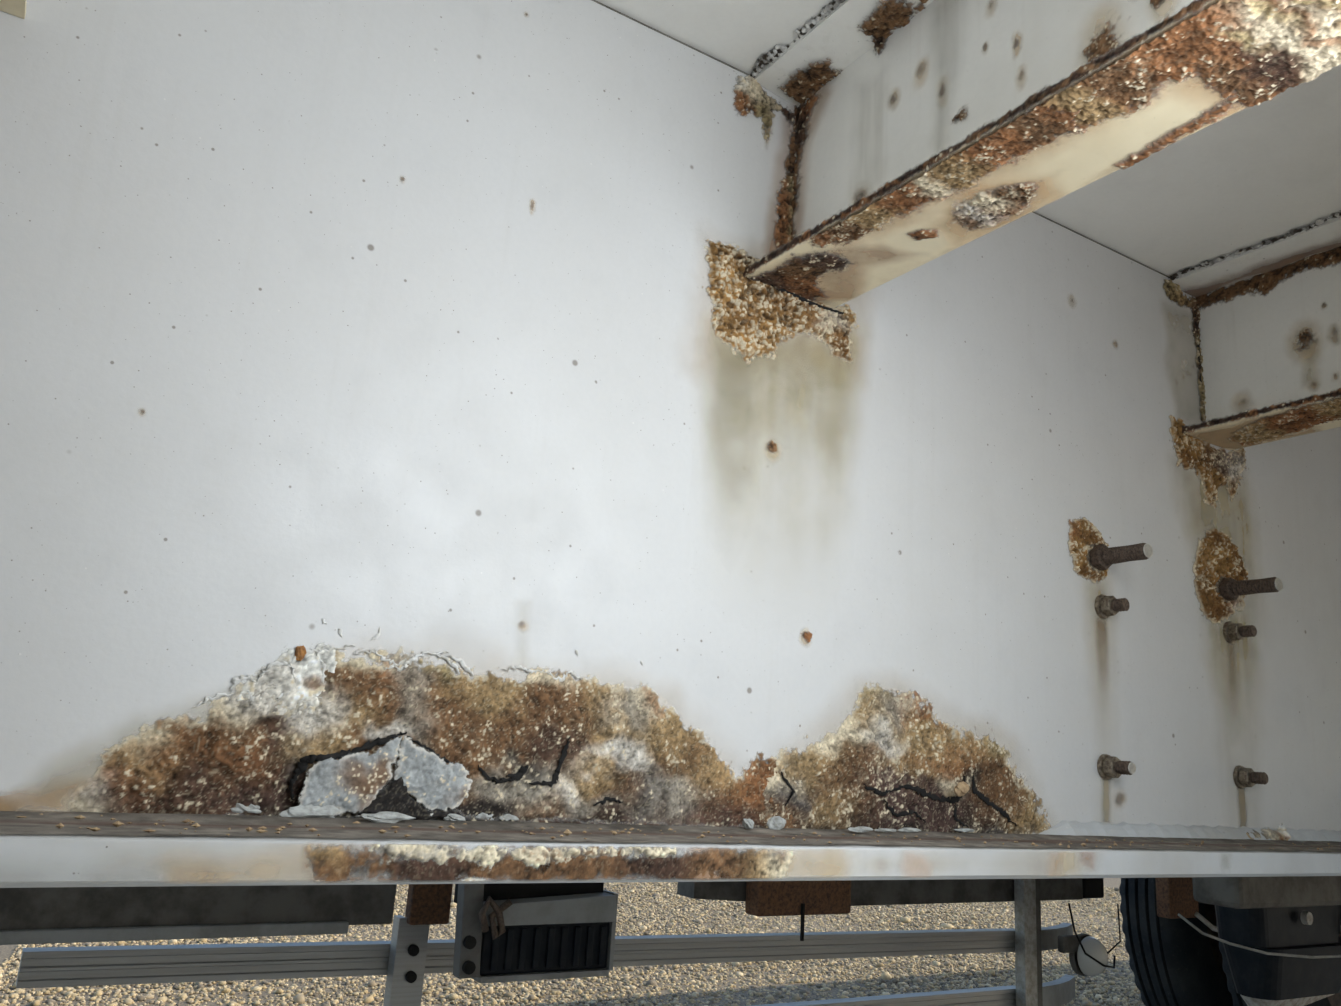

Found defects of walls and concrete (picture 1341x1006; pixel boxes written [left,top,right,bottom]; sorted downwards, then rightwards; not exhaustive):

rust [705,0,1341,376]
rust [1163,242,1341,682]
rust [1068,517,1109,595]
peeling [194,618,474,715]
rust [1103,780,1123,821]
rust [305,844,793,882]